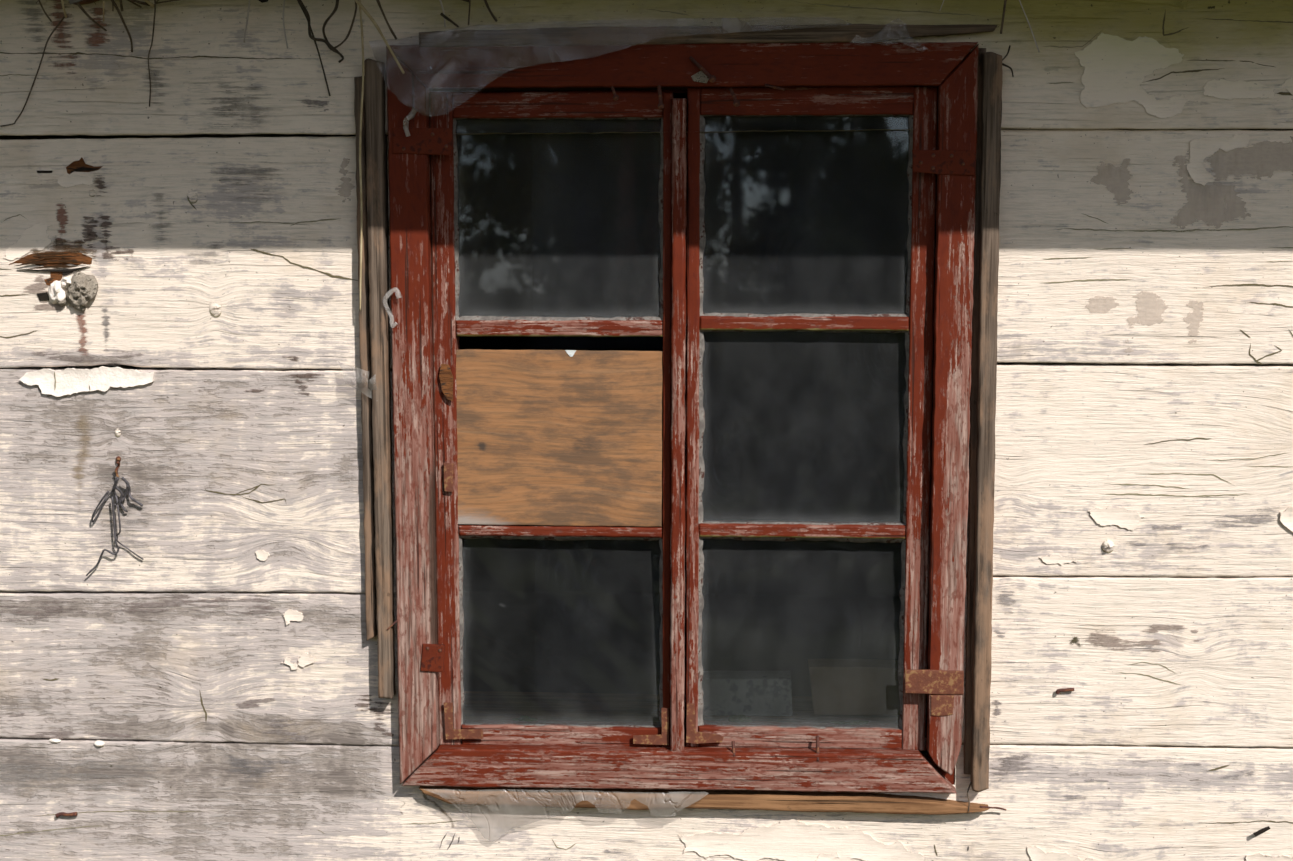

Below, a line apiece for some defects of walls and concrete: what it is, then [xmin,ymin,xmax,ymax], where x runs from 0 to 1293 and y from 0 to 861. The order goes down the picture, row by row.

peeling [1074,33,1293,118]
peeling [1091,159,1141,204]
peeling [1186,133,1293,186]
corrosion [56,204,68,241]
crack [1046,213,1293,365]
corrosion [77,313,87,355]
peeling [1279,507,1293,532]
peeling [678,818,924,861]